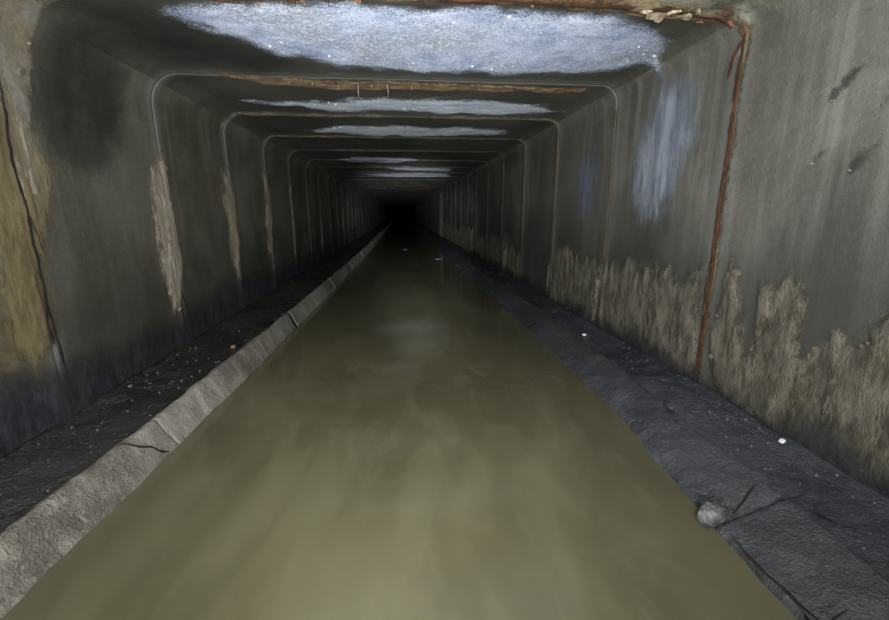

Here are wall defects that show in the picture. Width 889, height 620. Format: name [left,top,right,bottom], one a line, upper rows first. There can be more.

leakage [162,0,665,76]
leakage [650,0,769,28]
corrosion [214,72,591,97]
corrosion [386,0,751,378]
crack [0,81,76,414]
leakage [222,85,889,499]
crack [116,443,170,453]